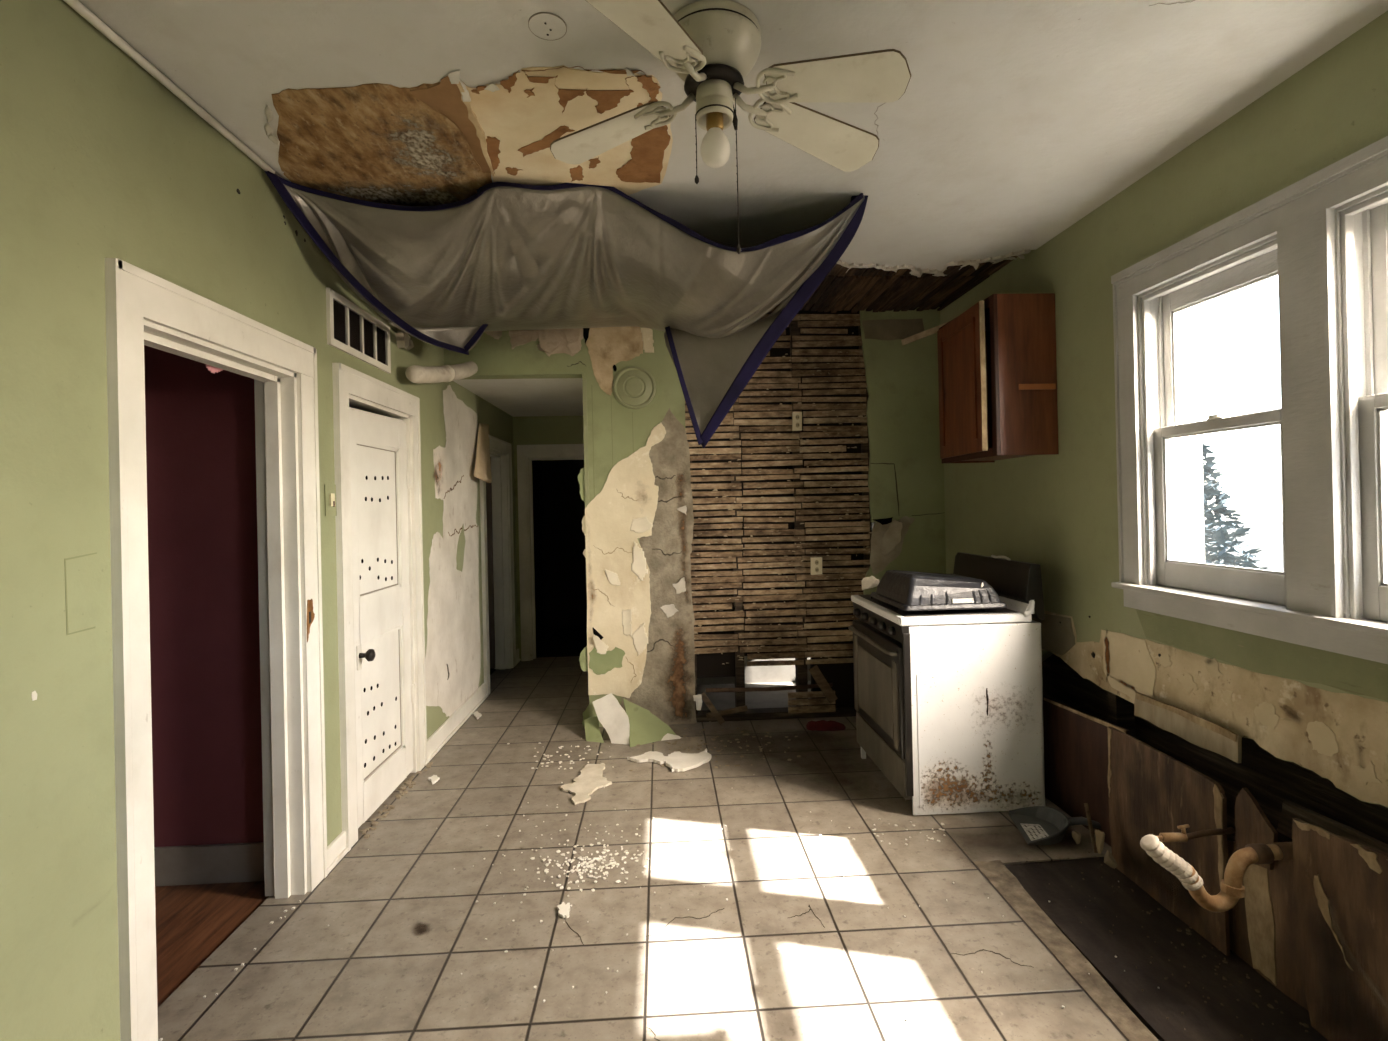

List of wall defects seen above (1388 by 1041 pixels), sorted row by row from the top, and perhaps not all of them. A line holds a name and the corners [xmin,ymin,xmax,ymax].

flaking render [264,65,673,206]
spalling [837,249,1031,277]
peeling [425,385,481,717]
peeling [577,408,697,727]
corrosion [922,741,1039,807]
peeling [1306,721,1339,757]